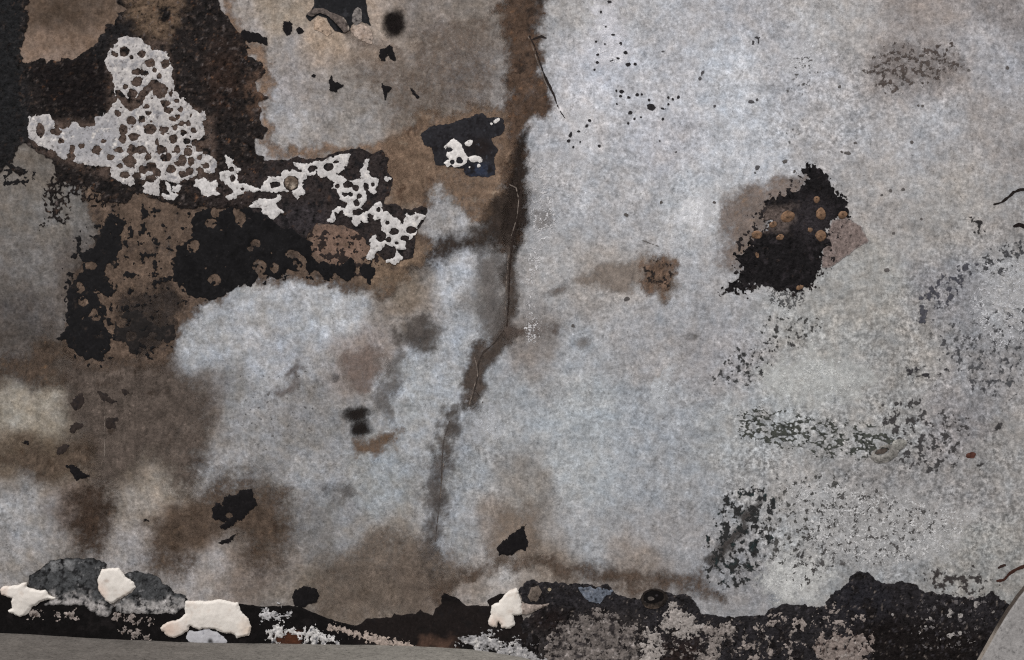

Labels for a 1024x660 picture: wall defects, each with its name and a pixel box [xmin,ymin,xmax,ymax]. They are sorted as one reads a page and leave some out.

crack [528,35,565,118]
peeling [27,36,426,368]
water stain [247,223,433,300]
crack [469,148,522,405]
corrosion [576,256,679,303]
corrosion [752,211,795,240]
corrosion [808,196,847,241]
water stain [0,186,294,575]
crack [435,421,450,542]
water stain [703,471,1000,605]
peeling [0,558,414,646]
peeling [454,586,875,660]